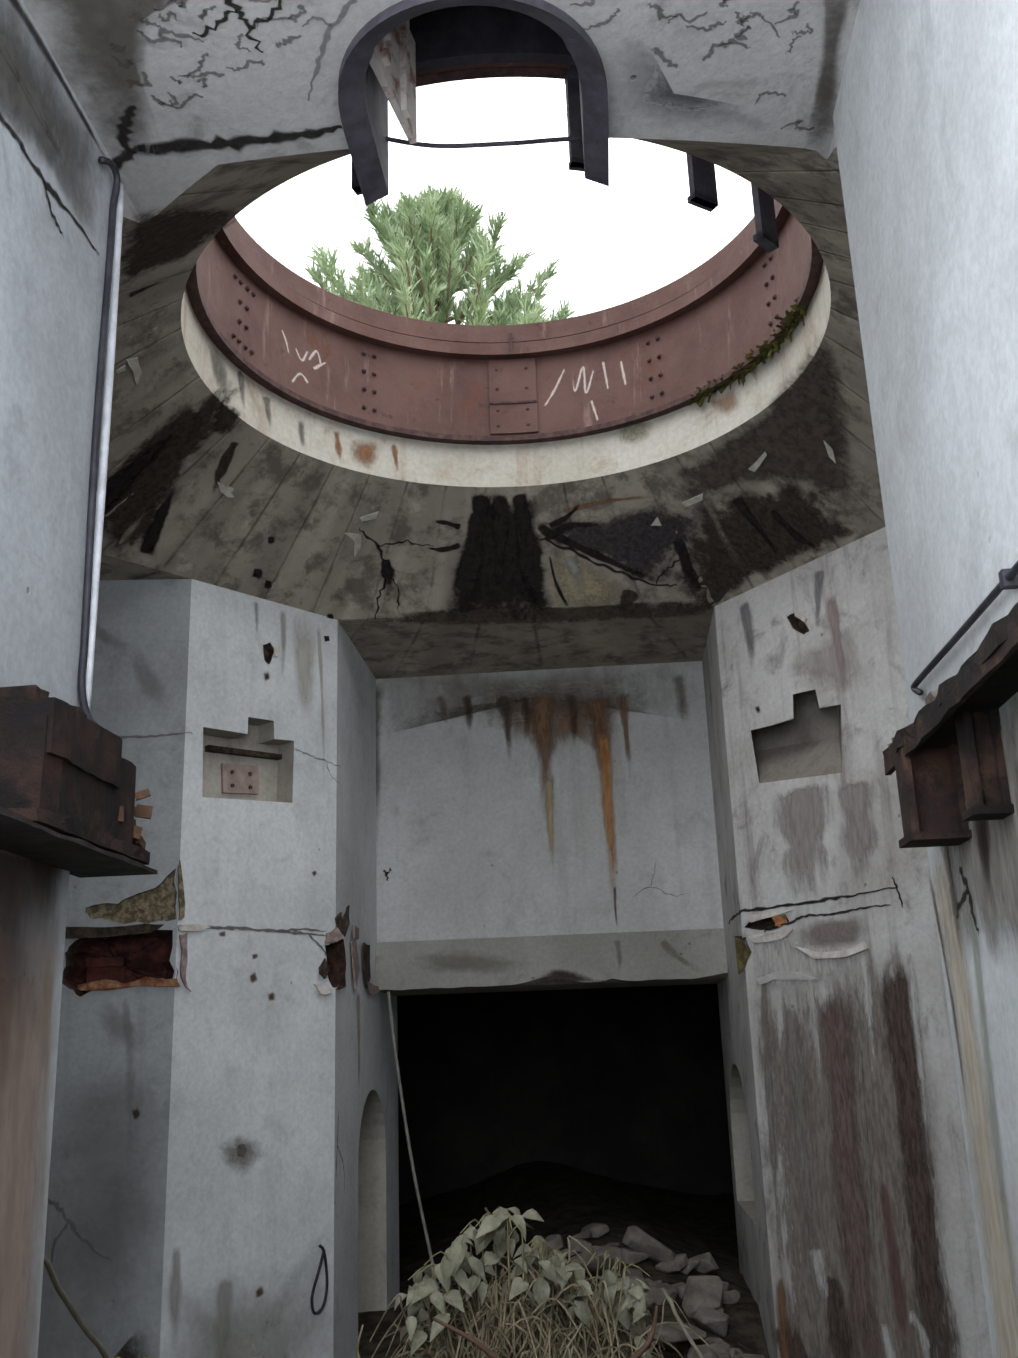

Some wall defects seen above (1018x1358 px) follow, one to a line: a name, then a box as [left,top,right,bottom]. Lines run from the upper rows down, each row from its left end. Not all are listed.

crack [112,0,357,169]
crack [570,0,813,68]
crack [0,113,99,255]
crack [359,529,431,620]
damp [381,494,707,624]
damp [741,603,753,656]
rust [498,695,629,868]
damp [779,781,876,881]
spalling [65,860,225,995]
spalling [313,905,381,1072]
damp [930,697,1018,1358]
damp [759,939,957,1358]